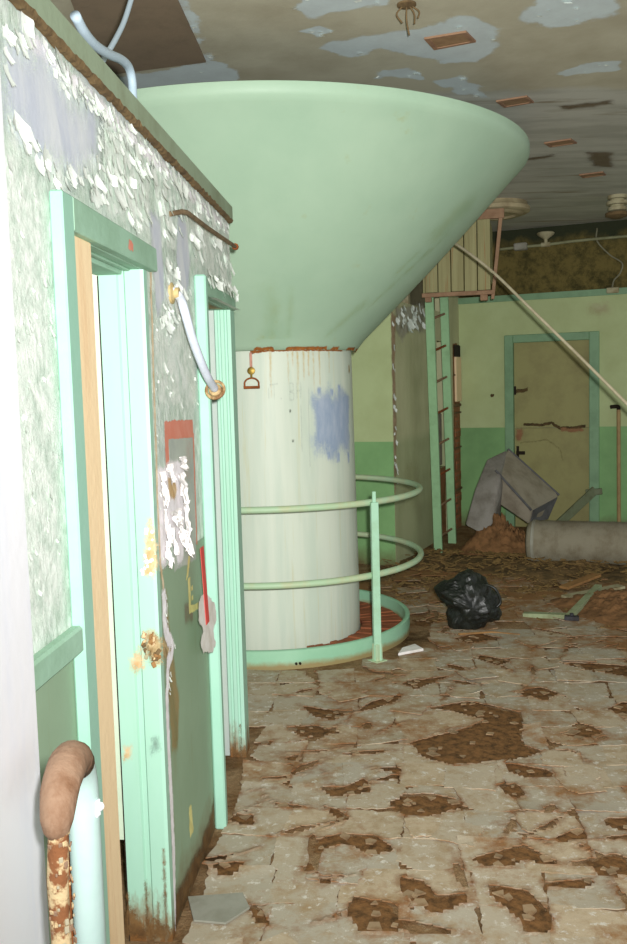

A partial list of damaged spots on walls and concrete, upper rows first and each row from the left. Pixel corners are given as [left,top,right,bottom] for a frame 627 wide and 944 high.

peeling [295,0,504,64]
flaking render [0,0,239,338]
rust [250,346,358,388]
crack [521,421,586,458]
peeling [410,702,555,798]
peeling [390,795,465,818]
peeling [304,809,393,871]
rust [47,831,77,944]
rust [123,848,175,942]
peeling [347,897,404,932]
peeling [400,878,467,913]
peeling [489,887,552,933]